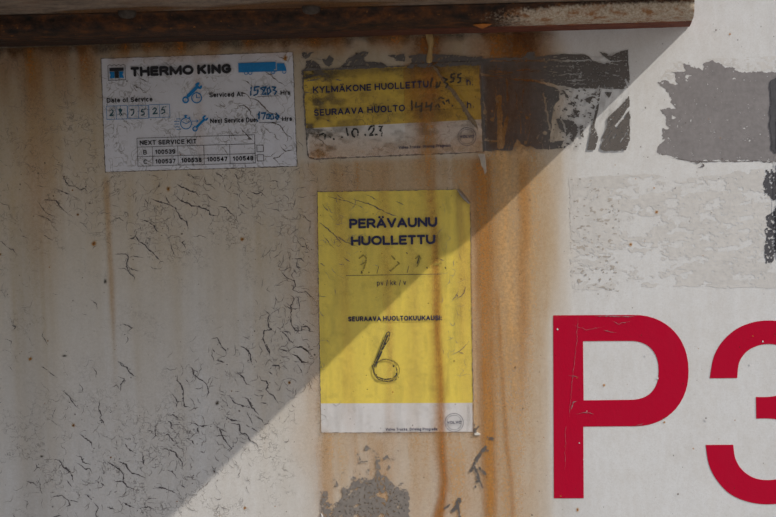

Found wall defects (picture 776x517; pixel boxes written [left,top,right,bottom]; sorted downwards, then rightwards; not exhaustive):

crack [0,43,404,517]
rust [436,374,447,517]
rust [475,32,540,517]
peeling [556,89,631,151]